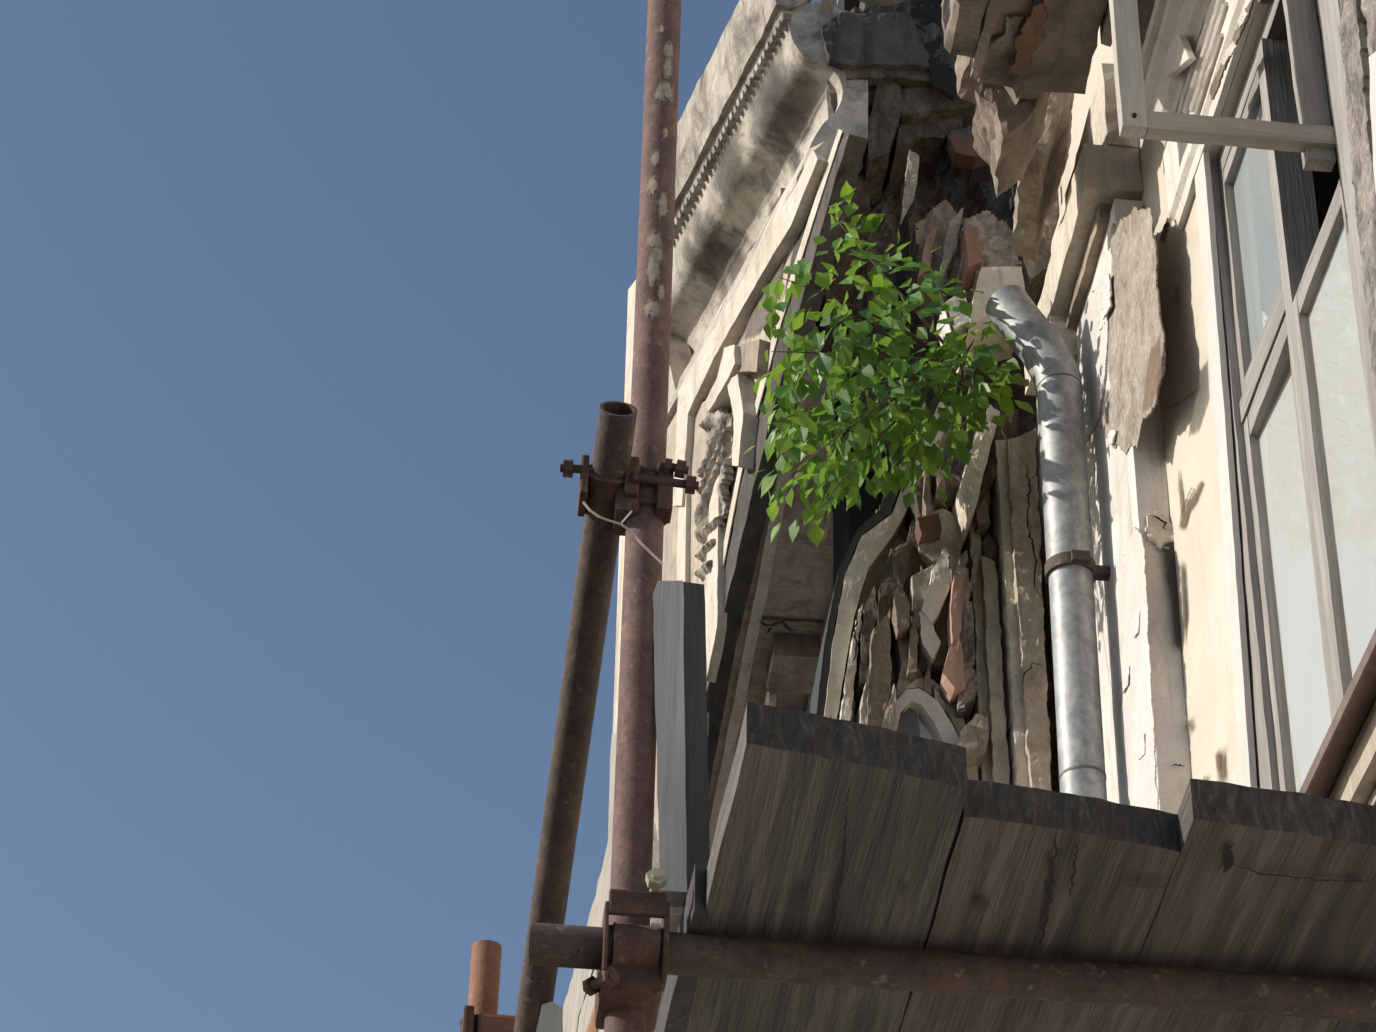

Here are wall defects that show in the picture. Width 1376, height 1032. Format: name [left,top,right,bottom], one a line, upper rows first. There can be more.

peeling [989,0,1048,75]
flaking render [1361,0,1376,56]
leakage [746,61,813,175]
flaking render [941,126,993,186]
leakage [684,222,757,303]
leakage [744,256,785,338]
flaking render [899,149,1022,311]
flaking render [912,513,942,551]
flaking render [939,551,978,721]